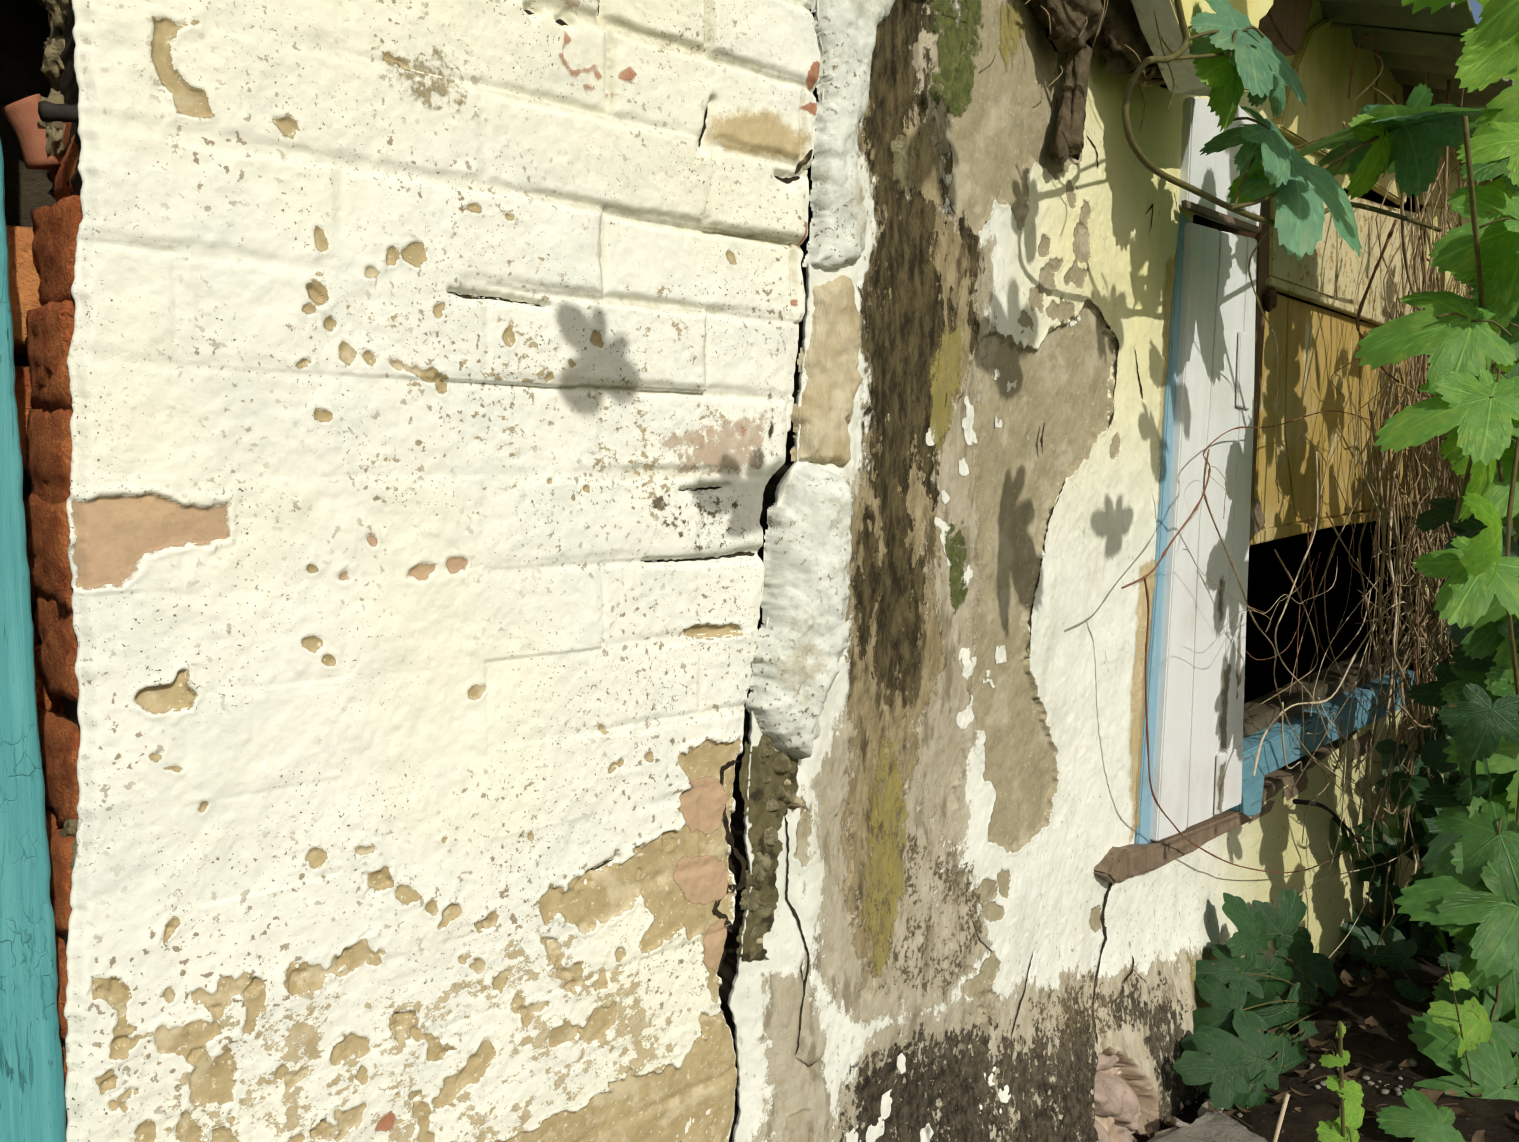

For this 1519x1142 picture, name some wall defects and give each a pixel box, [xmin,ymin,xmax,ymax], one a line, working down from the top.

peeling [559,33,636,96]
crack [795,149,813,174]
flaking render [71,494,231,590]
flaking render [135,670,198,714]
peeling [301,636,336,666]
leakage [753,0,1220,1142]
flaking render [934,0,1120,922]
flaking render [92,734,813,1142]
crack [712,760,747,976]
crack [784,810,817,1067]
peeling [962,951,1001,1022]
crack [1092,883,1147,1045]